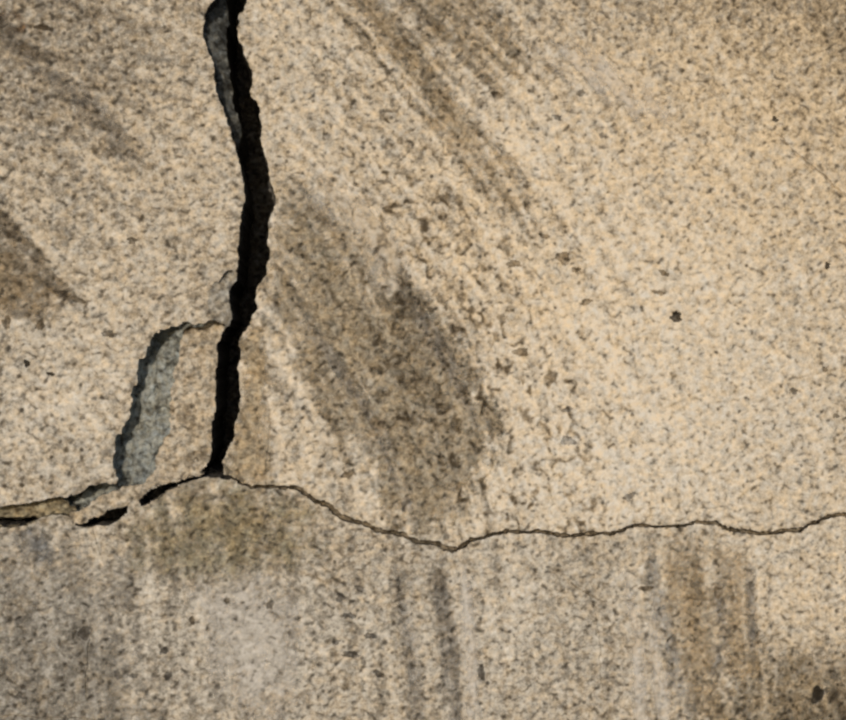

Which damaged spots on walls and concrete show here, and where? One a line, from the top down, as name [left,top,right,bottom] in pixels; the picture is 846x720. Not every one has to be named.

spalling [64,319,226,525]
crack [0,0,846,559]